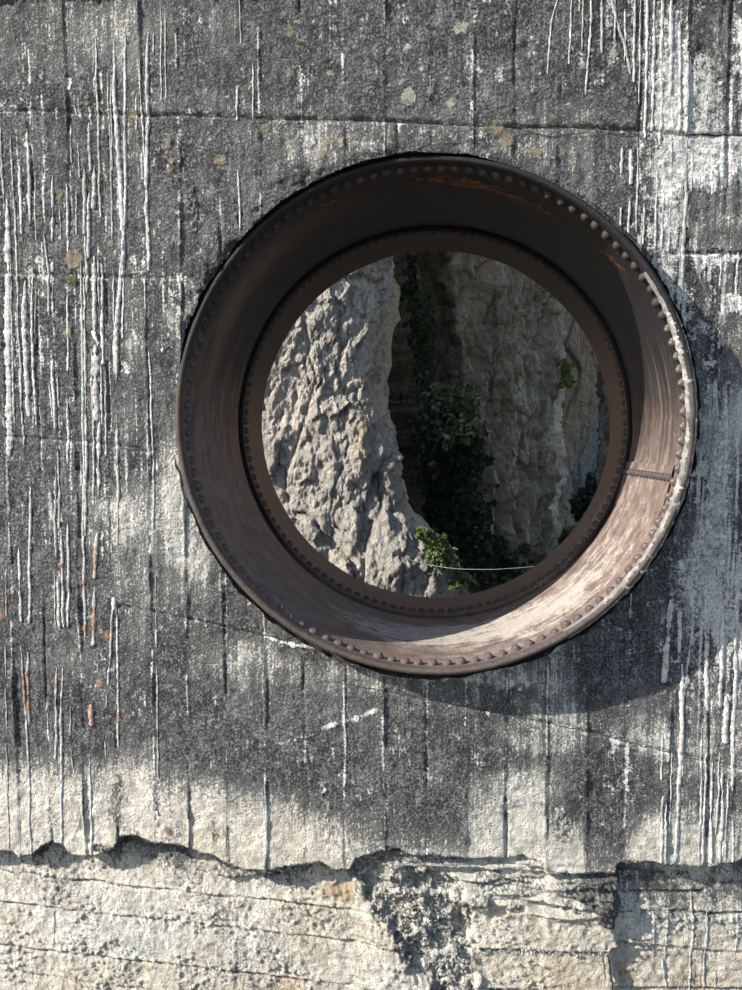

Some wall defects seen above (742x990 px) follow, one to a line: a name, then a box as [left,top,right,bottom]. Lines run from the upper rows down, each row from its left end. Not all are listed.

leakage [568,0,707,293]
leakage [0,7,167,646]
leakage [563,271,698,639]
leakage [105,597,120,757]
leakage [266,636,312,648]
leakage [660,390,740,865]
leakage [54,666,94,864]
spalling [88,773,312,878]
spalling [319,781,330,813]
spalling [553,807,569,842]
spalling [355,854,653,990]
crack [603,956,613,990]